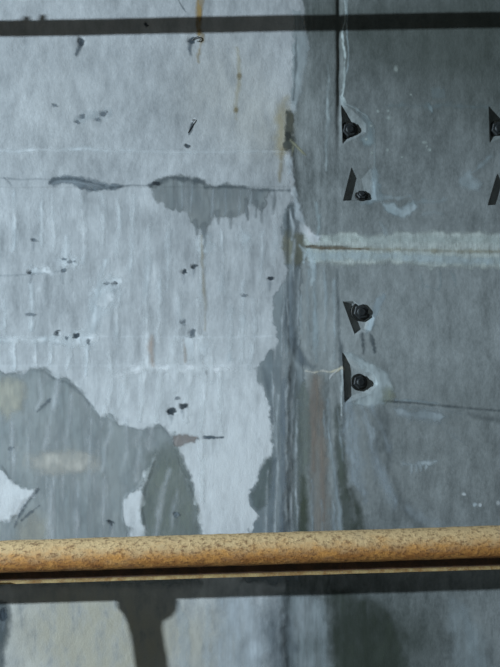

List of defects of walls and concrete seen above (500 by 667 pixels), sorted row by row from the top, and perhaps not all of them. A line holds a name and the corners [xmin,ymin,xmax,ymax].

water stain [49,176,121,191]
water stain [149,175,275,254]